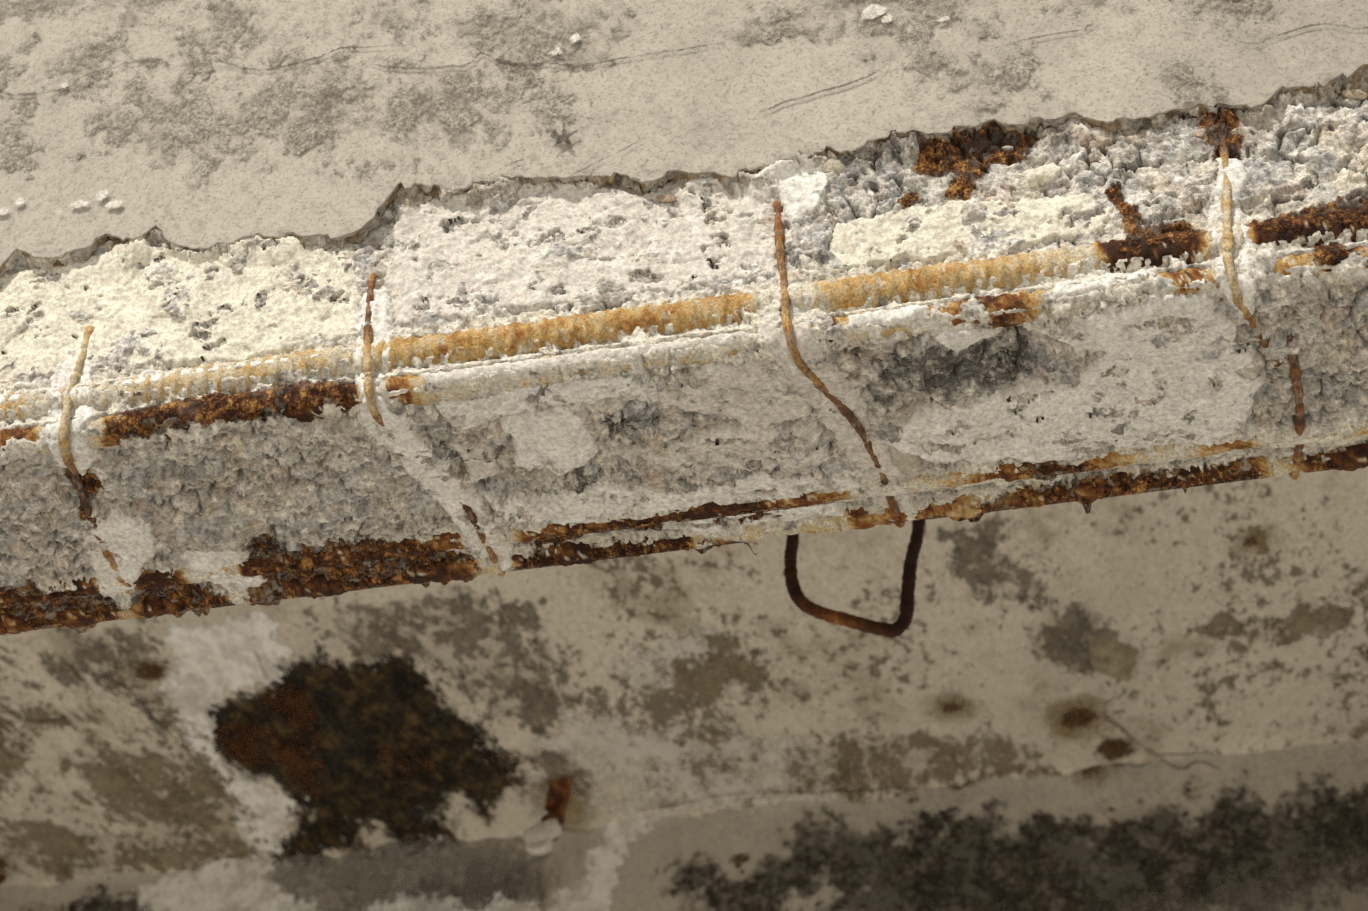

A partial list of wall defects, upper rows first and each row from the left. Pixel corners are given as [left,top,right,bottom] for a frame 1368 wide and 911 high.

crack [1008,24,1092,45]
crack [1279,24,1368,35]
crack [0,58,153,96]
crack [761,72,876,112]
rust [911,122,1038,201]
rust [1104,181,1212,256]
spalling [0,64,1368,625]
rust [103,378,356,440]
leakage [1274,433,1368,449]
rust [0,529,479,634]
rust [180,645,550,869]
leakage [0,547,1368,911]